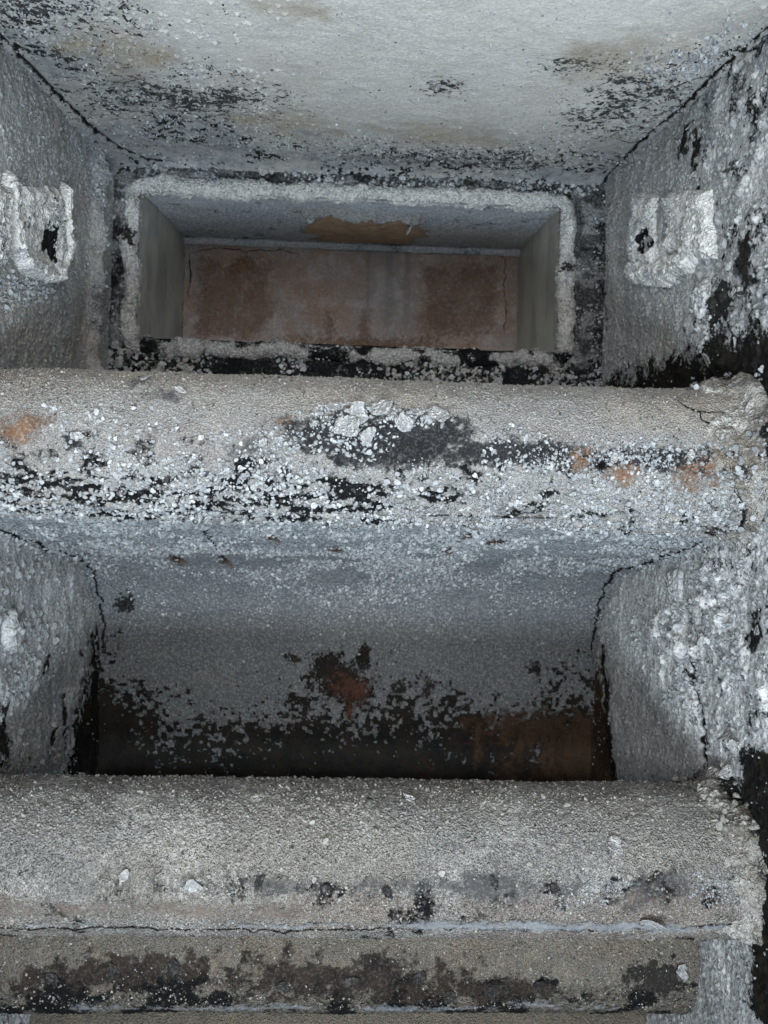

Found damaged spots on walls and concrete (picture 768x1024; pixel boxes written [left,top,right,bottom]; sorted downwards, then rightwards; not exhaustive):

peeling [293,205,430,245]
crack [0,530,108,654]
crack [590,542,701,664]
corrosion [460,703,593,783]
crack [1,922,732,934]
damp [153,1003,309,1011]